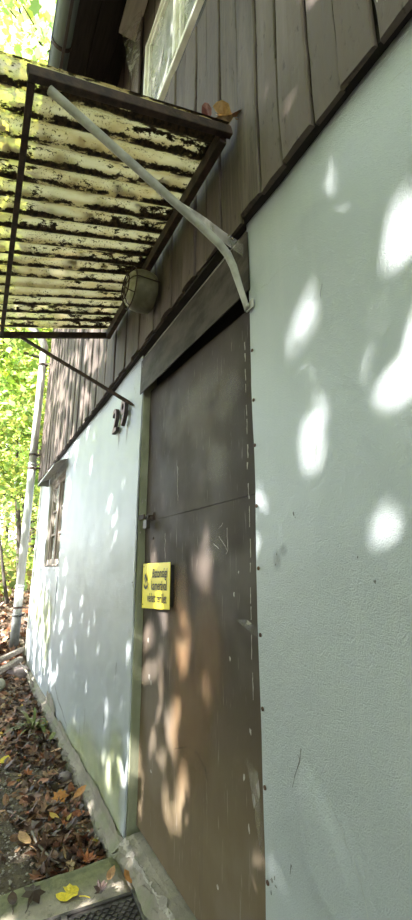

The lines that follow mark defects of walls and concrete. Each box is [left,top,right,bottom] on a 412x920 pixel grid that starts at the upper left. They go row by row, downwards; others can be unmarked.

spalling [46,691,175,920]